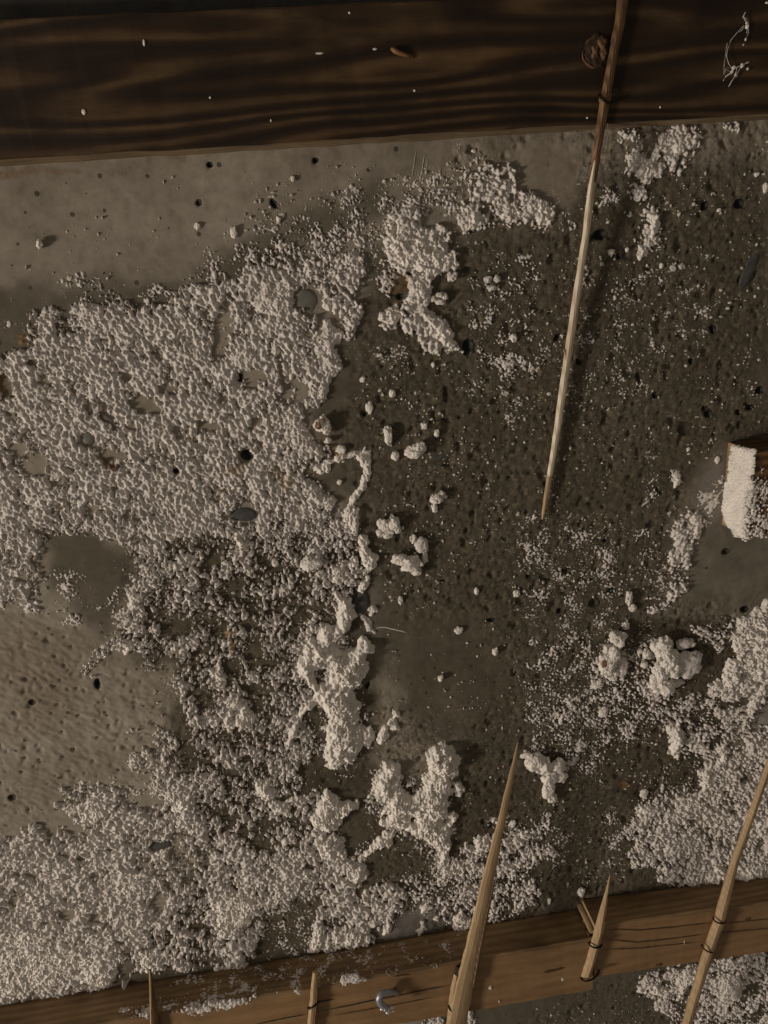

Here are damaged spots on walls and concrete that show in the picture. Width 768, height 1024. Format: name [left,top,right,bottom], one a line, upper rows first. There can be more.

peeling [583,160,607,240]
spalling [462,338,473,356]
peeling [409,534,428,564]
peeling [641,648,650,669]